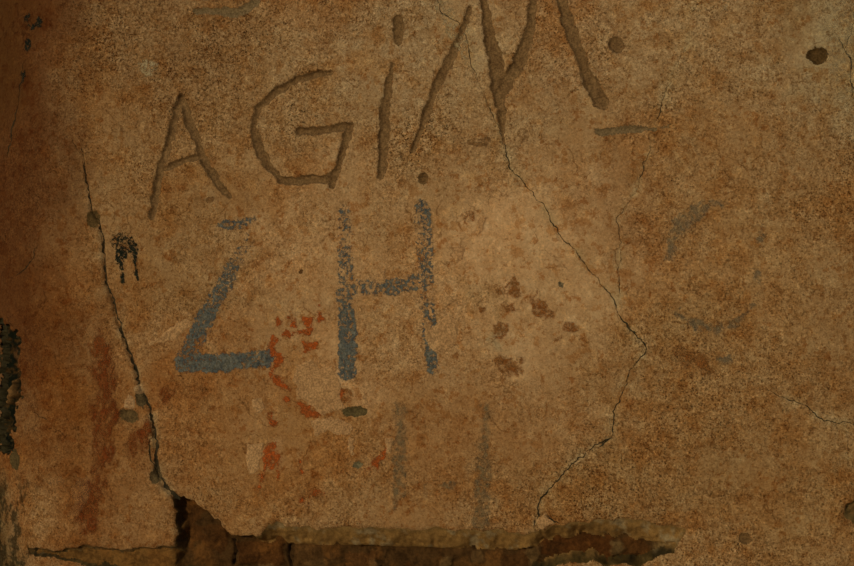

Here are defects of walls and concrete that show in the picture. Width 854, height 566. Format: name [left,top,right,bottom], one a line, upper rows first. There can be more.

crack [838,9,854,95]
flaking render [0,318,24,470]
crack [72,140,180,500]
crack [437,0,647,528]
crack [765,388,854,448]
flaking render [28,496,686,566]